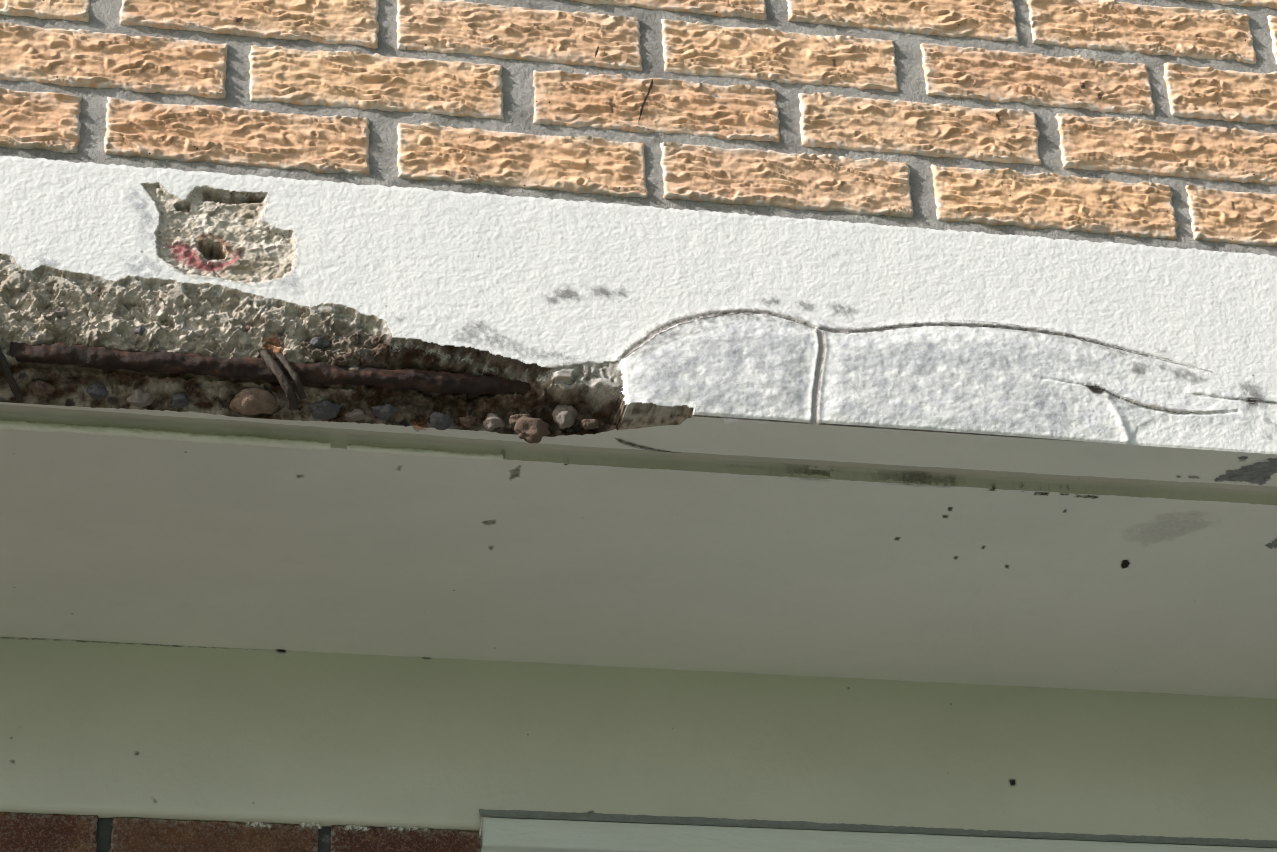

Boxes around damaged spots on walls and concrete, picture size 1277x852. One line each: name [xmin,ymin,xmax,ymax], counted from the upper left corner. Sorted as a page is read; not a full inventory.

spalling [0,182,694,443]
crack [620,309,1272,425]
peeling [1215,456,1277,485]